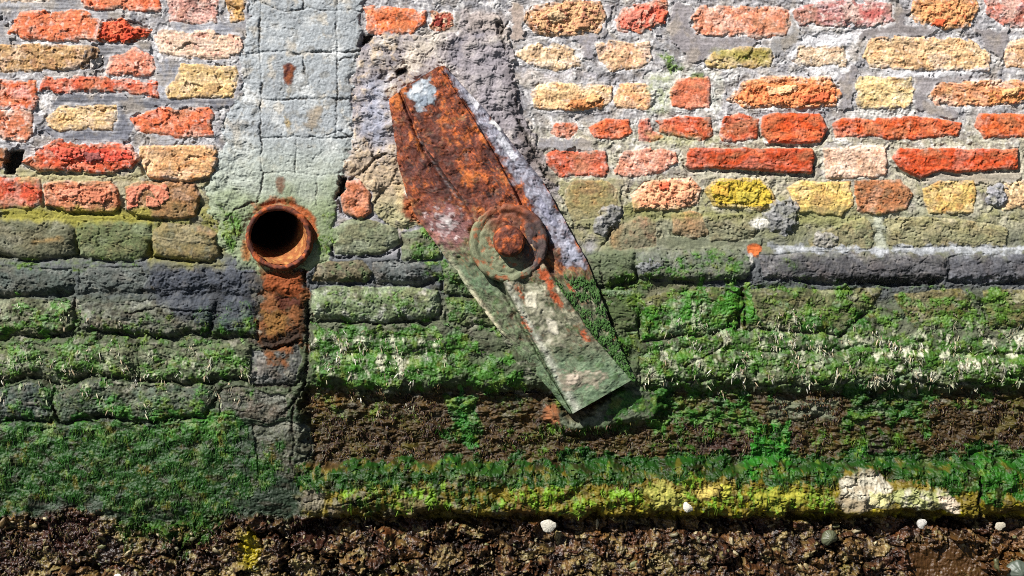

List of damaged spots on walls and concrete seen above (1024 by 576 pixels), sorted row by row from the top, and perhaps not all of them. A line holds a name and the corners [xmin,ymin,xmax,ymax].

corrosion [255,177,318,240]
corrosion [403,195,422,225]
water stain [767,216,1024,286]
water stain [150,264,251,329]
corrosion [244,241,310,366]
corrosion [543,404,559,424]
water stain [695,484,731,499]
water stain [838,470,960,514]